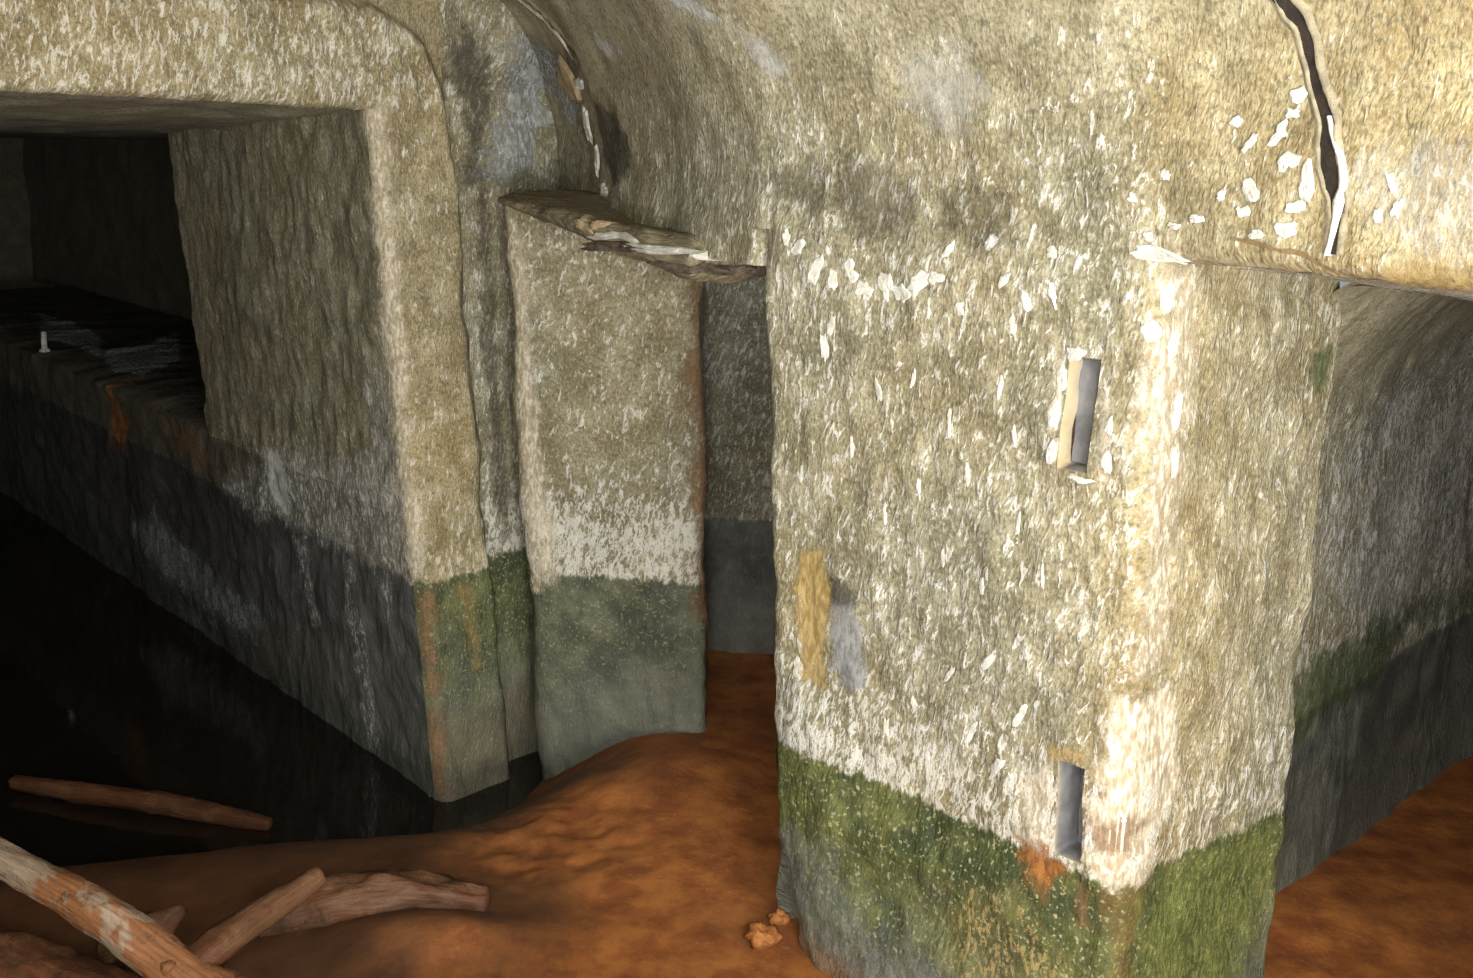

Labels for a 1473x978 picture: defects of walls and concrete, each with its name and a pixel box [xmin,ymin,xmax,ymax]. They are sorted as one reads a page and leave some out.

spalling [479,31,630,197]
crack [1231,0,1473,295]
spalling [573,219,756,277]
corrosion [1019,842,1065,883]